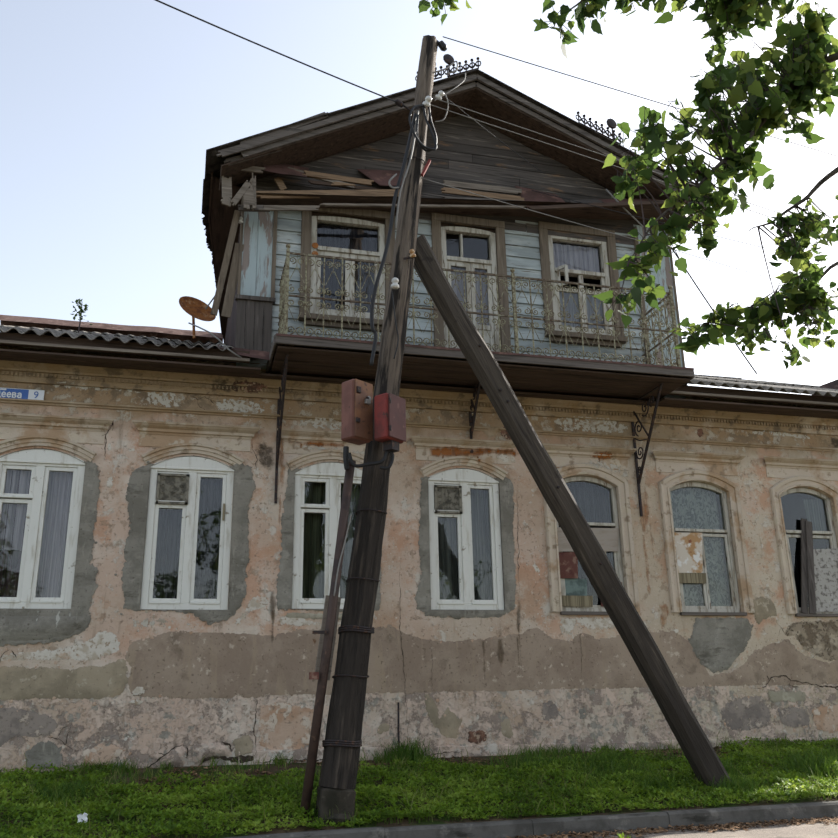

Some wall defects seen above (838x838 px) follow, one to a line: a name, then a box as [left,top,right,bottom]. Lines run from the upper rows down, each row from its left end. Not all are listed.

peeling [216,379,267,416]
peeling [554,416,629,433]
spalling [785,619,838,661]
crack [754,675,838,690]
spalling [0,700,63,769]
peeling [82,741,132,765]
spalling [425,694,493,750]
spalling [541,700,560,726]